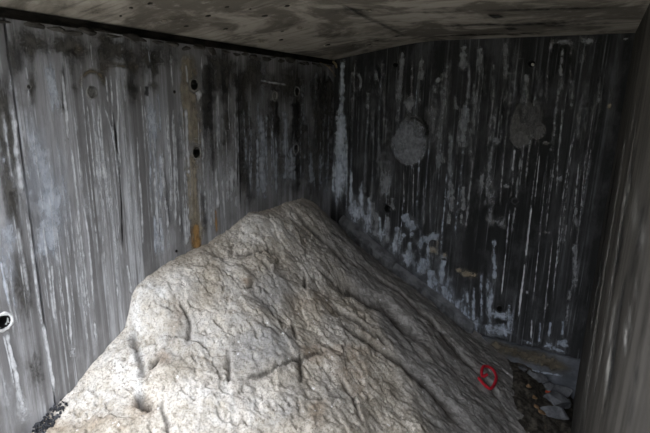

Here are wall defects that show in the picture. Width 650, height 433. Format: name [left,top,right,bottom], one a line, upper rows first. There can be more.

rust [185,156,203,248]
water stain [0,27,593,389]